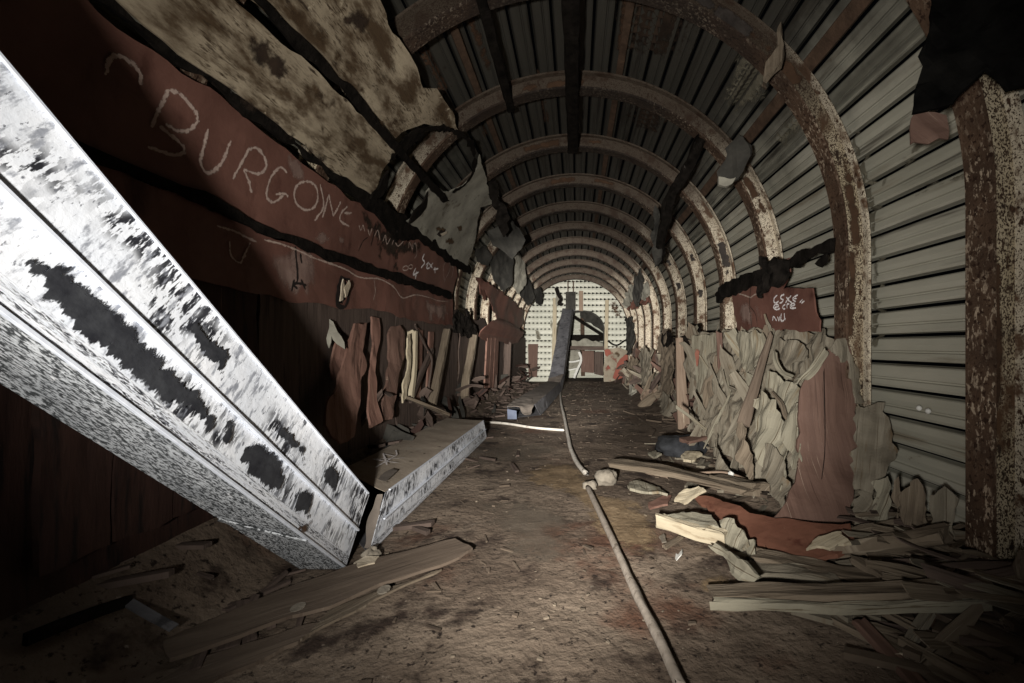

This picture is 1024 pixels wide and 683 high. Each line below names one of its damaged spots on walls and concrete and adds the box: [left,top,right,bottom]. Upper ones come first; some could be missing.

damp [343,11,369,33]
corrosion [742,176,766,213]
corrosion [842,158,862,337]
corrosion [997,231,1011,408]
peeling [548,349,660,470]
peeling [617,421,778,518]
peeling [736,330,803,470]
peeling [791,612,888,626]